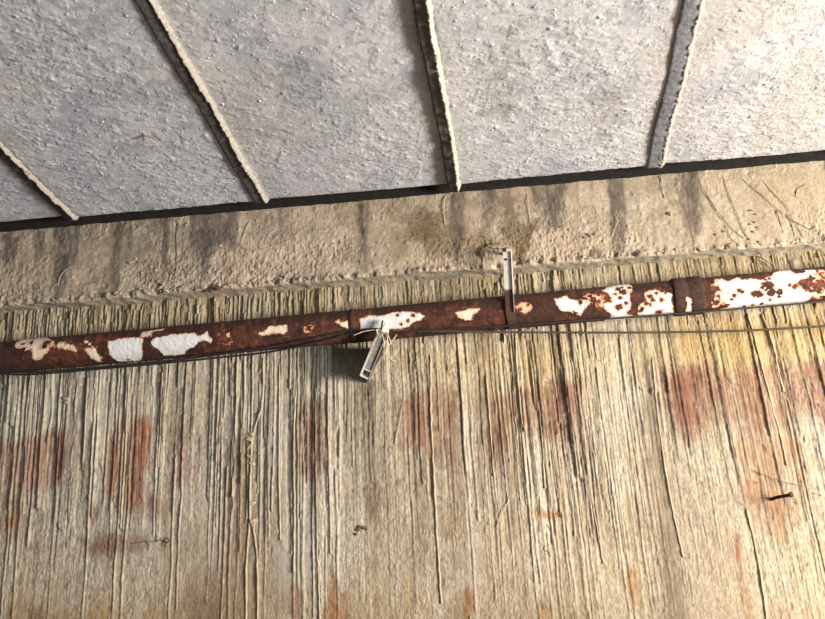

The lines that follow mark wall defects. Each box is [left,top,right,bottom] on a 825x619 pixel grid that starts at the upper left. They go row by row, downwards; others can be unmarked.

damp [359,201,367,253]
damp [609,179,626,243]
damp [678,172,702,226]
damp [54,226,78,298]
spalling [106,271,290,295]
corrosion [109,422,146,504]